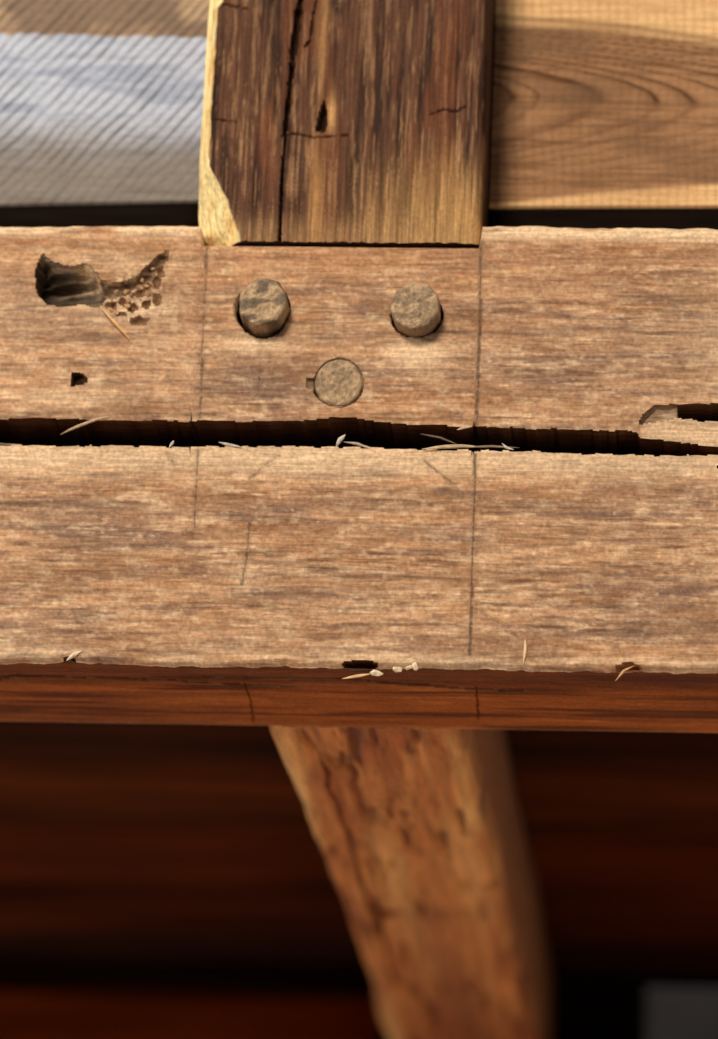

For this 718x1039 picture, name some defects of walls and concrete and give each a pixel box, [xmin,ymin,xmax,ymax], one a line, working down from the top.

crack [277,0,318,242]
spalling [34,250,169,325]
crack [0,403,718,468]